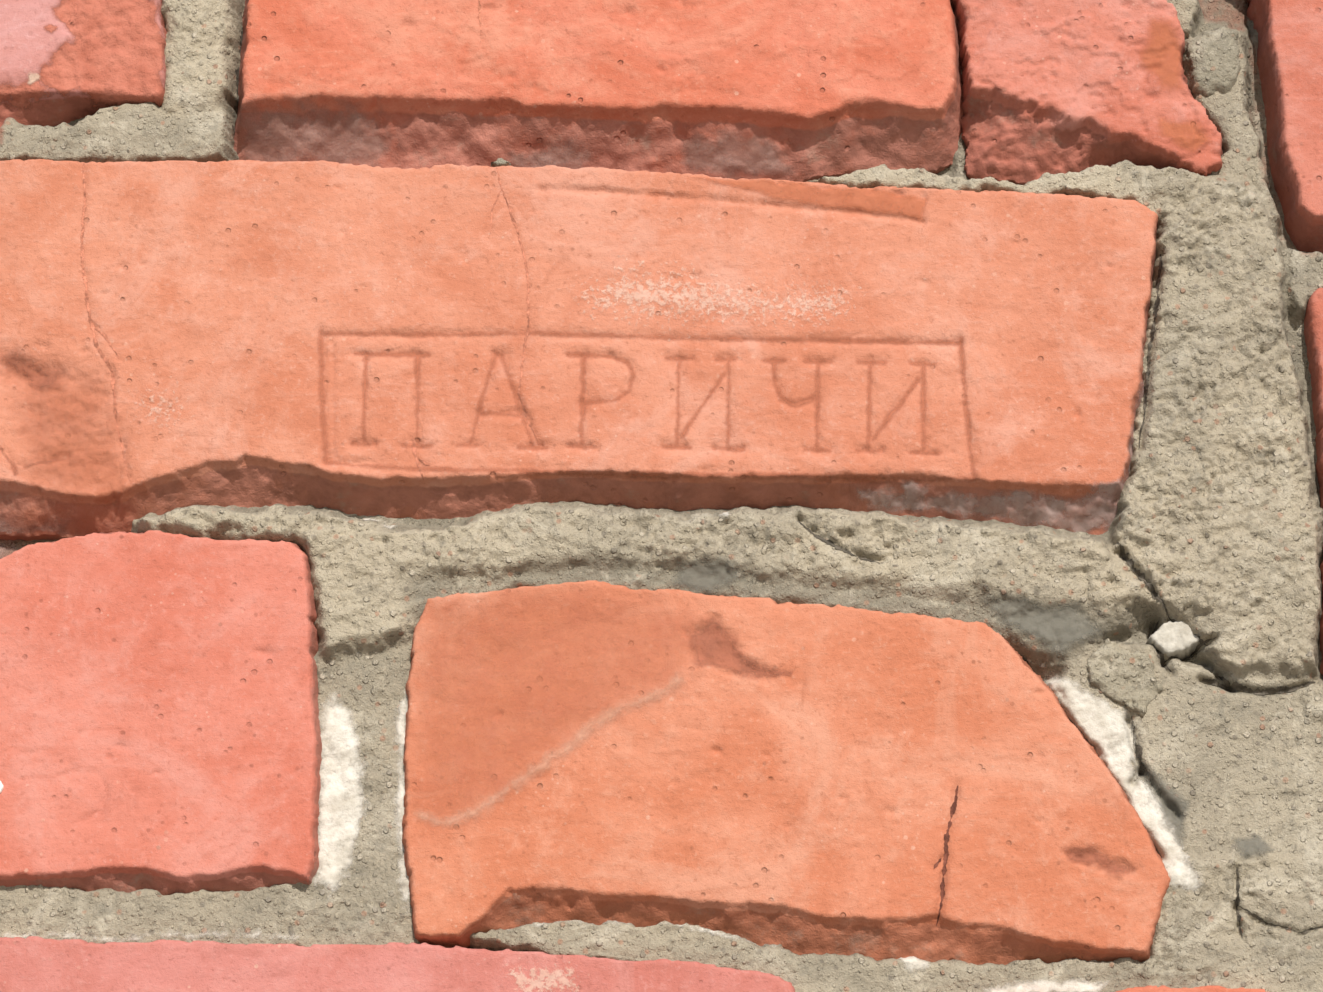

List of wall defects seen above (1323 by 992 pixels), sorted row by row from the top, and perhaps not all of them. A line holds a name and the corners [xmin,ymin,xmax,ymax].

spalling [0,0,166,109]
leakage [315,696,363,890]
leakage [396,699,409,899]
crack [934,786,958,926]
leakage [1045,676,1201,888]
leakage [1237,837,1269,858]